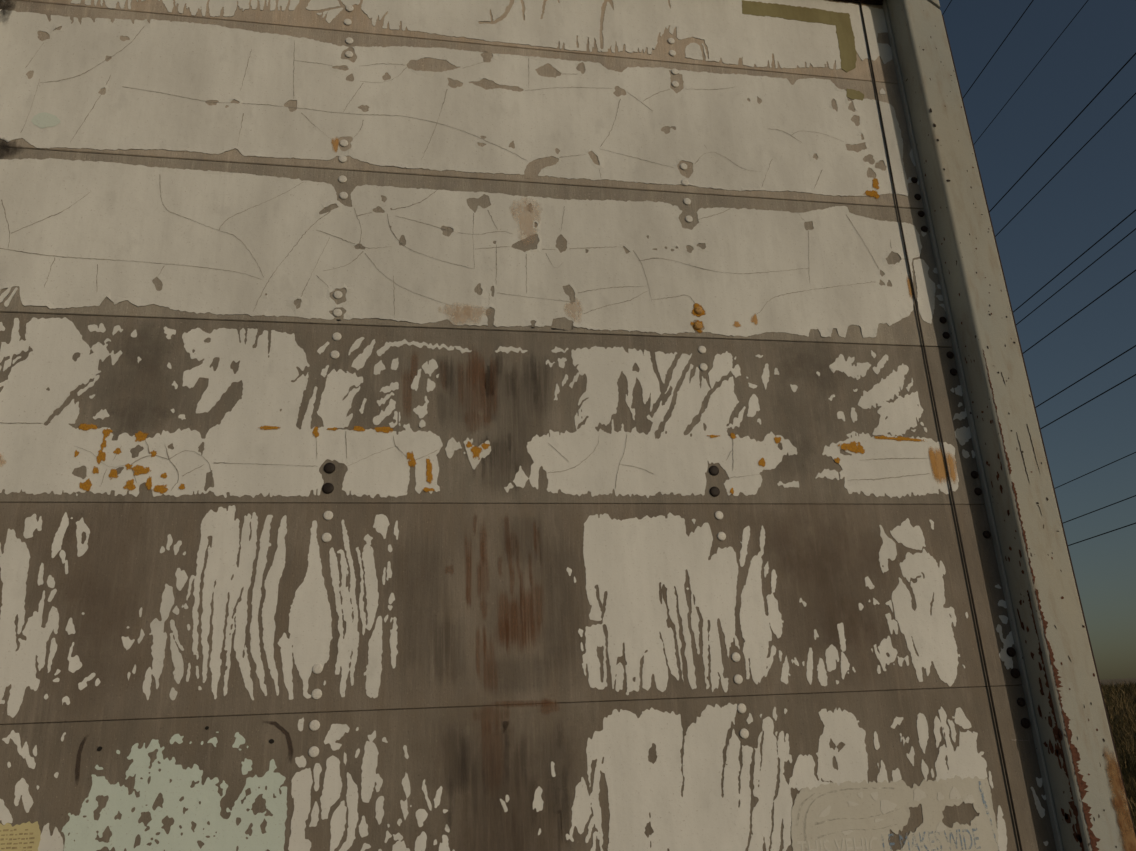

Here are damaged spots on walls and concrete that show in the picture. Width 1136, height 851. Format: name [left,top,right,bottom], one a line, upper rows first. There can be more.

crack [21,27,525,160]
peeling [2,0,900,178]
crack [525,59,772,186]
crack [0,182,891,315]
rust [78,424,185,494]
peeling [0,251,1003,700]
rust [874,436,956,481]
rust [983,350,1100,851]
peeling [0,512,101,825]
peeling [566,513,993,851]
peeling [38,724,455,851]
rust [1104,752,1136,851]